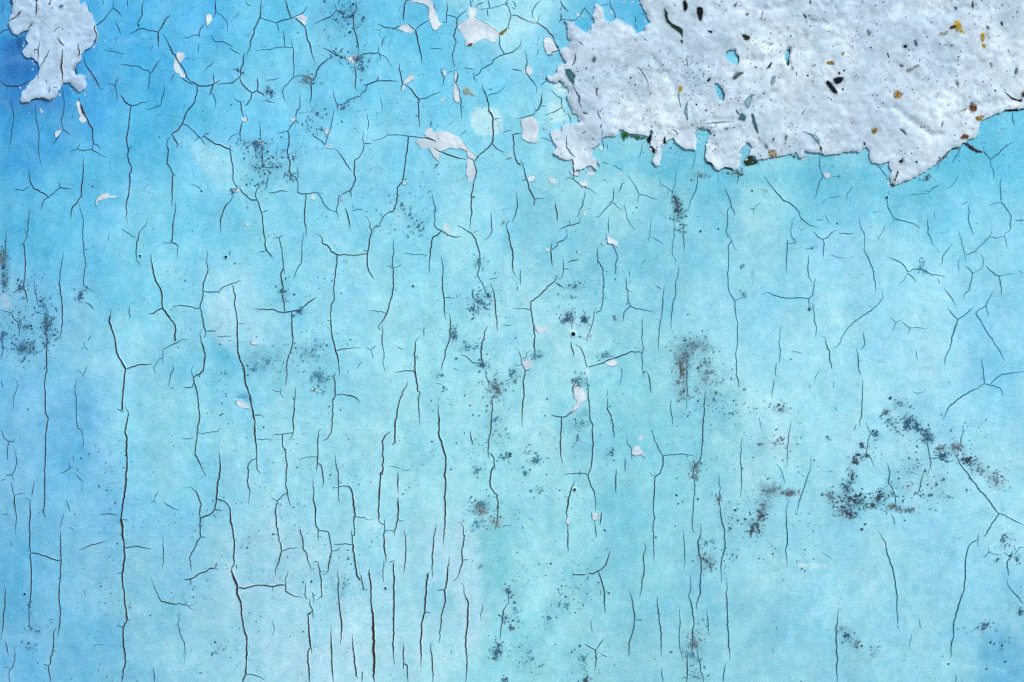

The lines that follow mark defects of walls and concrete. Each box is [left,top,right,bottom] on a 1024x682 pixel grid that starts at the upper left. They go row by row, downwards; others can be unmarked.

flaking render [8,0,98,123]
peeling [415,128,480,183]
flaking render [520,0,1024,187]
crack [0,0,762,682]
peeling [568,369,589,414]
crack [724,110,1024,682]
damp [821,391,1009,531]